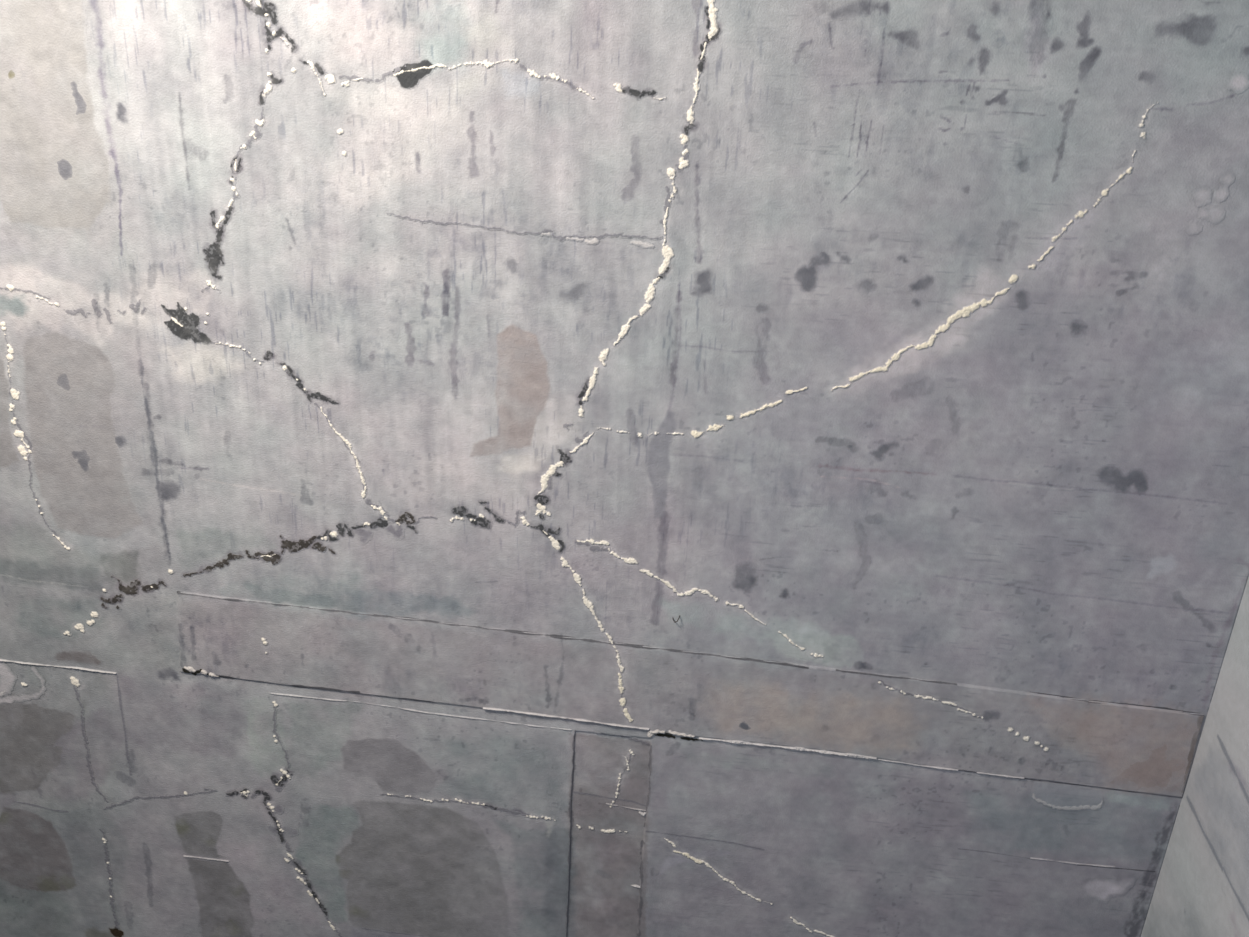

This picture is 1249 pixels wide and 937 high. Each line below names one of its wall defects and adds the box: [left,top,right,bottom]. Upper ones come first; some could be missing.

crack [0,321,71,551]
crack [0,284,147,324]
water stain [469,322,553,458]
crack [63,0,1160,834]
crack [69,676,344,937]
crack [663,838,836,937]